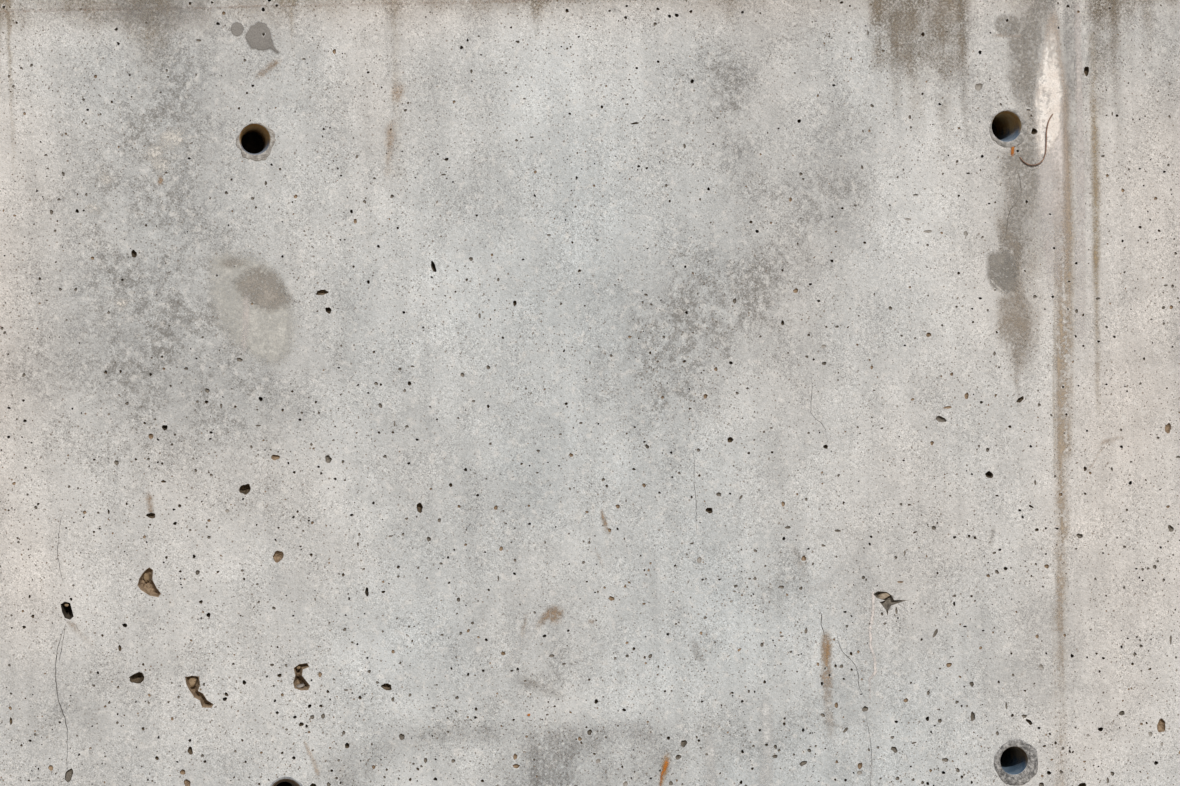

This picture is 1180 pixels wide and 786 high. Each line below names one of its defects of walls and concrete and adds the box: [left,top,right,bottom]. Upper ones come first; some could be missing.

leakage [873,0,966,59]
leakage [988,214,1029,349]
leakage [1007,0,1117,560]
rust [821,635,831,686]